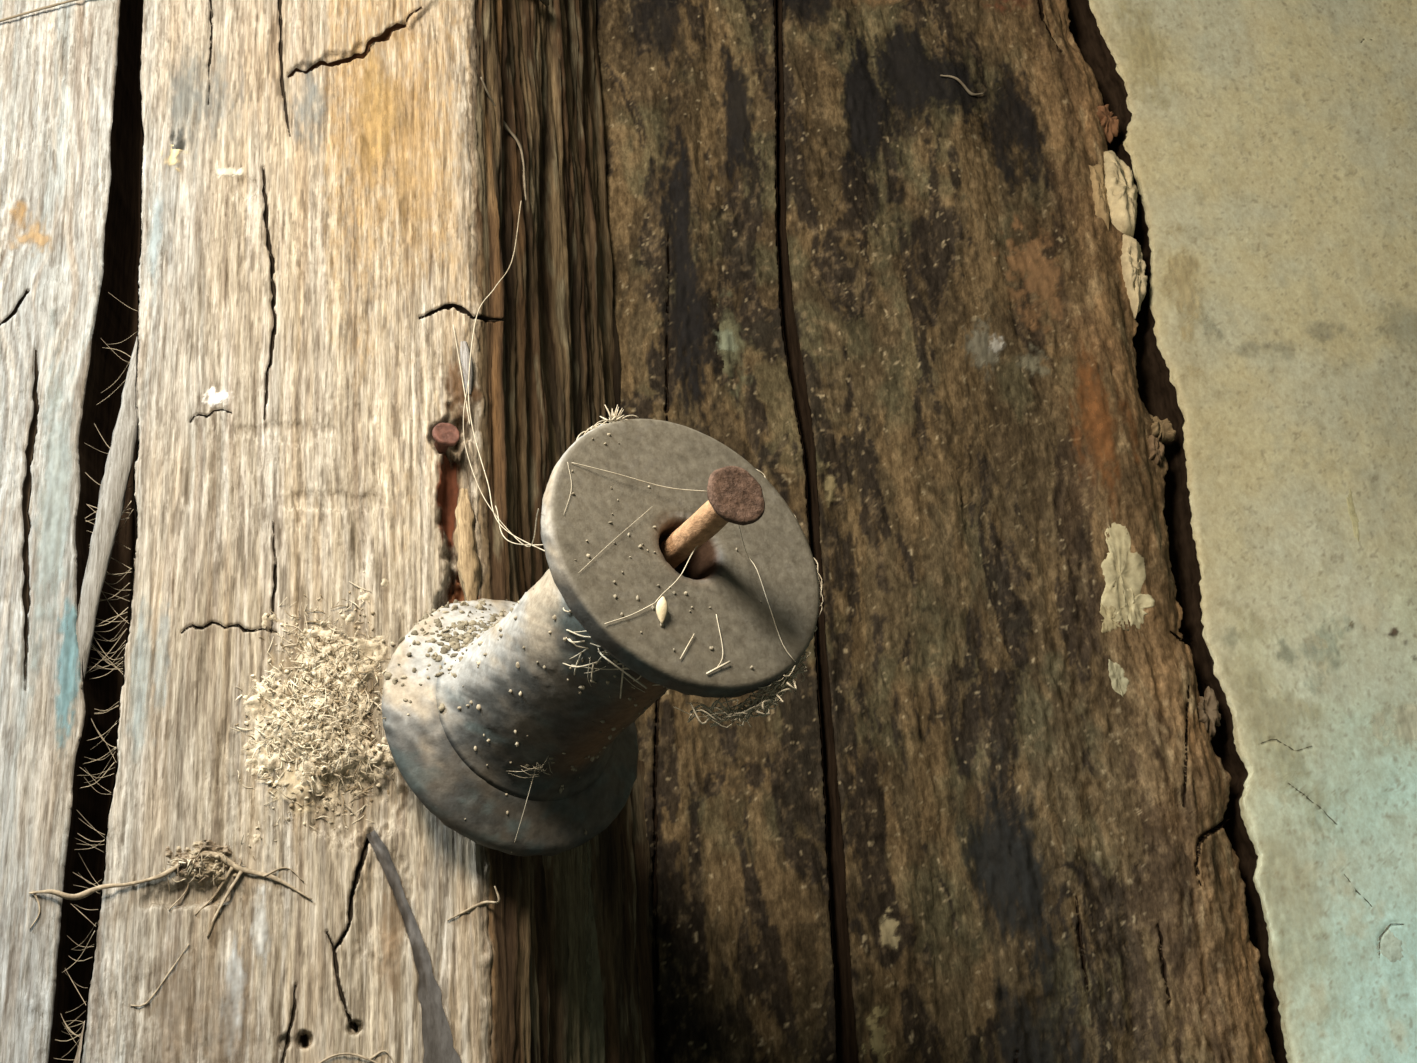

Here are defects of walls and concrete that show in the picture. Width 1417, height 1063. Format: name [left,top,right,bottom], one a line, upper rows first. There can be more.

crack [278,0,422,136]
crack [0,290,29,326]
crack [190,167,276,423]
rust [446,363,482,425]
rust [436,454,459,550]
rust [448,573,479,604]
crack [774,0,858,1063]
peeling [1100,522,1155,633]
crack [1038,0,1336,1063]
crack [326,832,370,1029]
crack [281,985,296,1063]